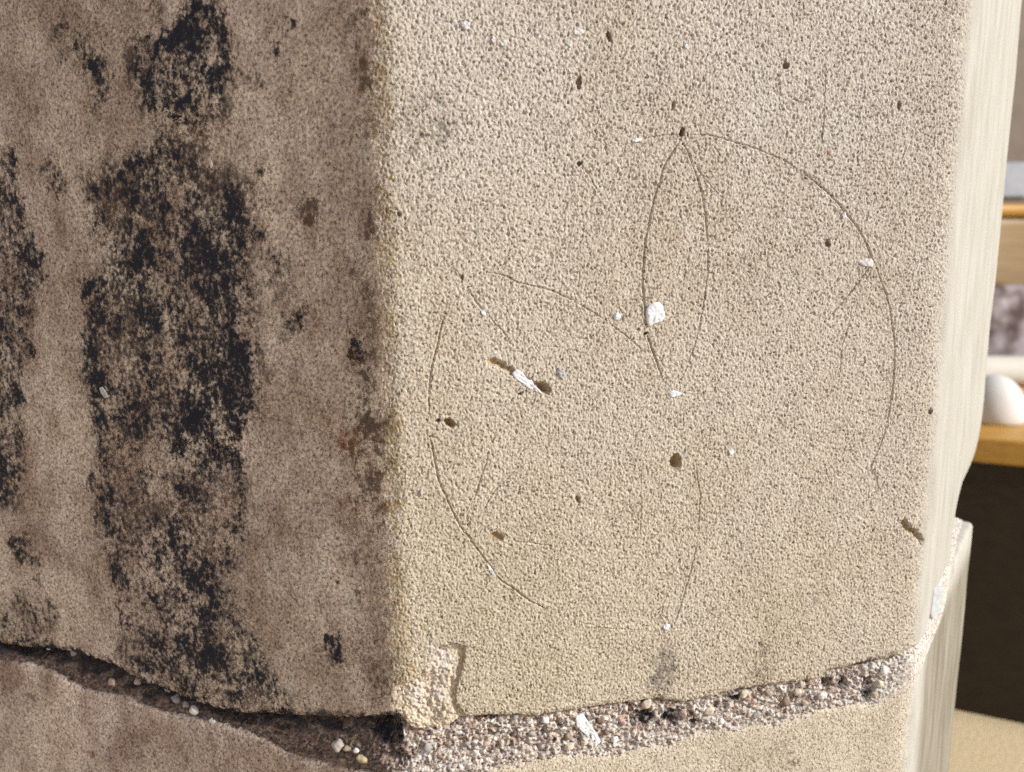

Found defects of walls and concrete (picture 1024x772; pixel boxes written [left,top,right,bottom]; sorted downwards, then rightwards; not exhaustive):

damp [0,0,459,718]
spalling [392,642,469,729]